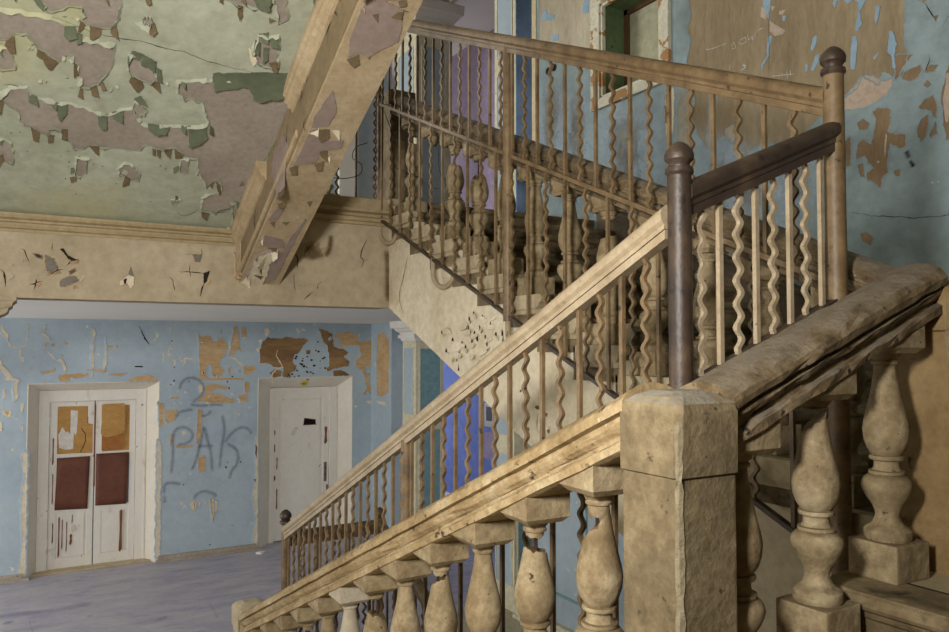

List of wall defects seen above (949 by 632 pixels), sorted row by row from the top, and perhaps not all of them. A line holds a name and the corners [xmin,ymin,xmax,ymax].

peeling [347,0,409,68]
peeling [539,0,590,48]
peeling [686,0,949,189]
peeling [0,0,344,290]
peeling [0,325,159,383]
peeling [440,311,503,371]
peeling [0,358,25,432]
peeling [154,325,390,559]
spalling [16,449,31,578]